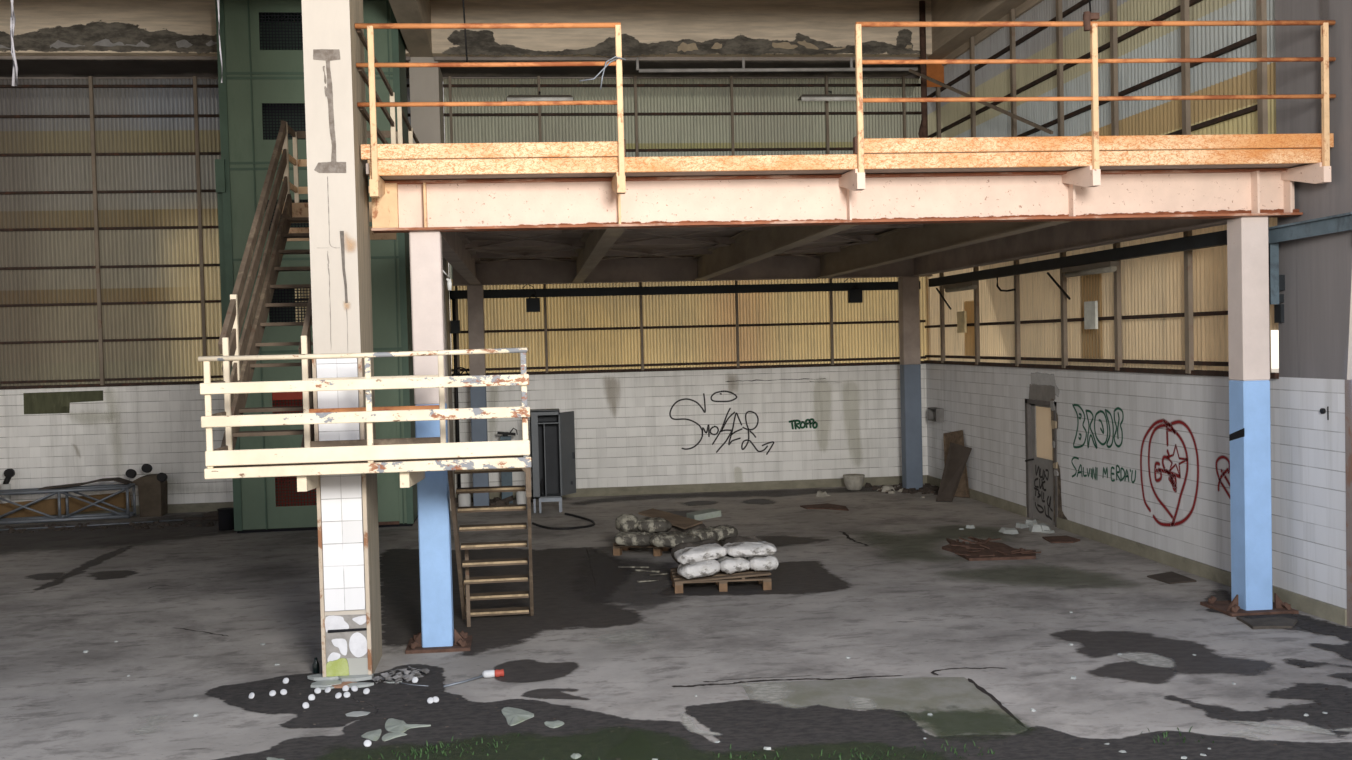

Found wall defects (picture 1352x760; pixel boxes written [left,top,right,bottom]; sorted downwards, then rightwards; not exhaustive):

peeling [0,20,217,54]
peeling [442,29,920,57]
peeling [23,390,103,414]
peeling [325,614,368,675]